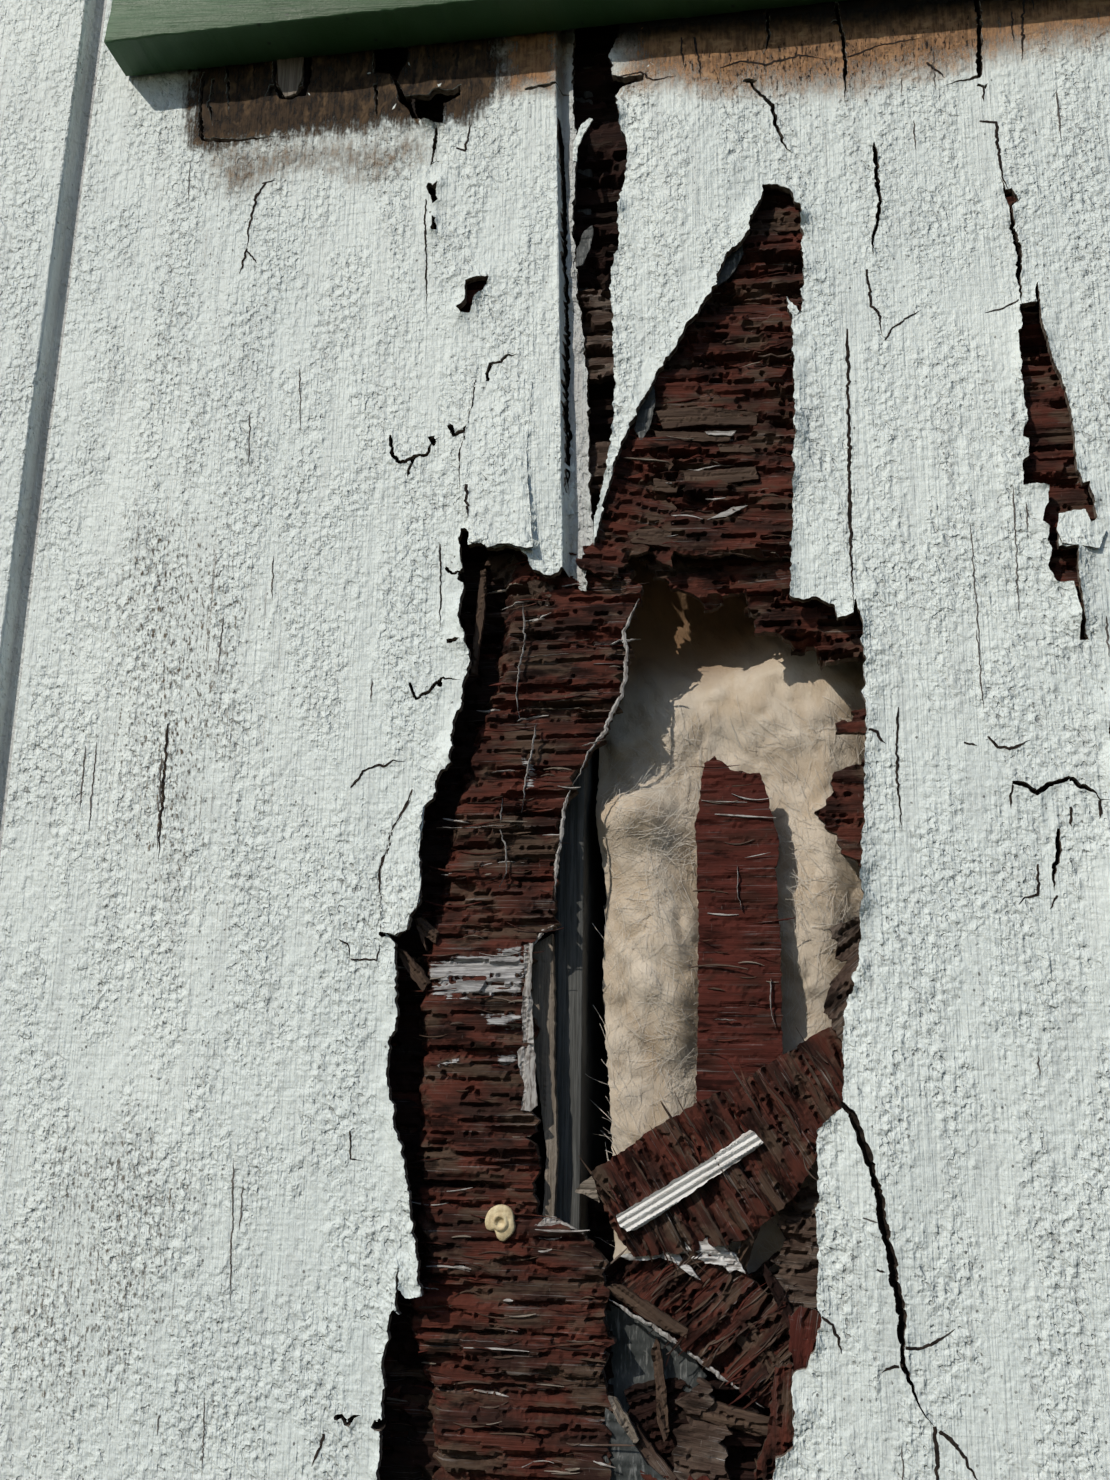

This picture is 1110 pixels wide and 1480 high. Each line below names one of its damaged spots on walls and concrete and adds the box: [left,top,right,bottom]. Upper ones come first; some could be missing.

leakage [181,31,561,183]
crack [621,0,1039,313]
crack [1054,90,1062,137]
peeling [459,281,487,312]
crack [845,149,922,610]
peeling [460,380,533,549]
peeling [527,579,555,606]
peeling [576,436,677,583]
peeling [1056,509,1106,549]
peeling [380,791,426,935]
crack [819,1314,842,1354]
crack [839,1101,978,1480]